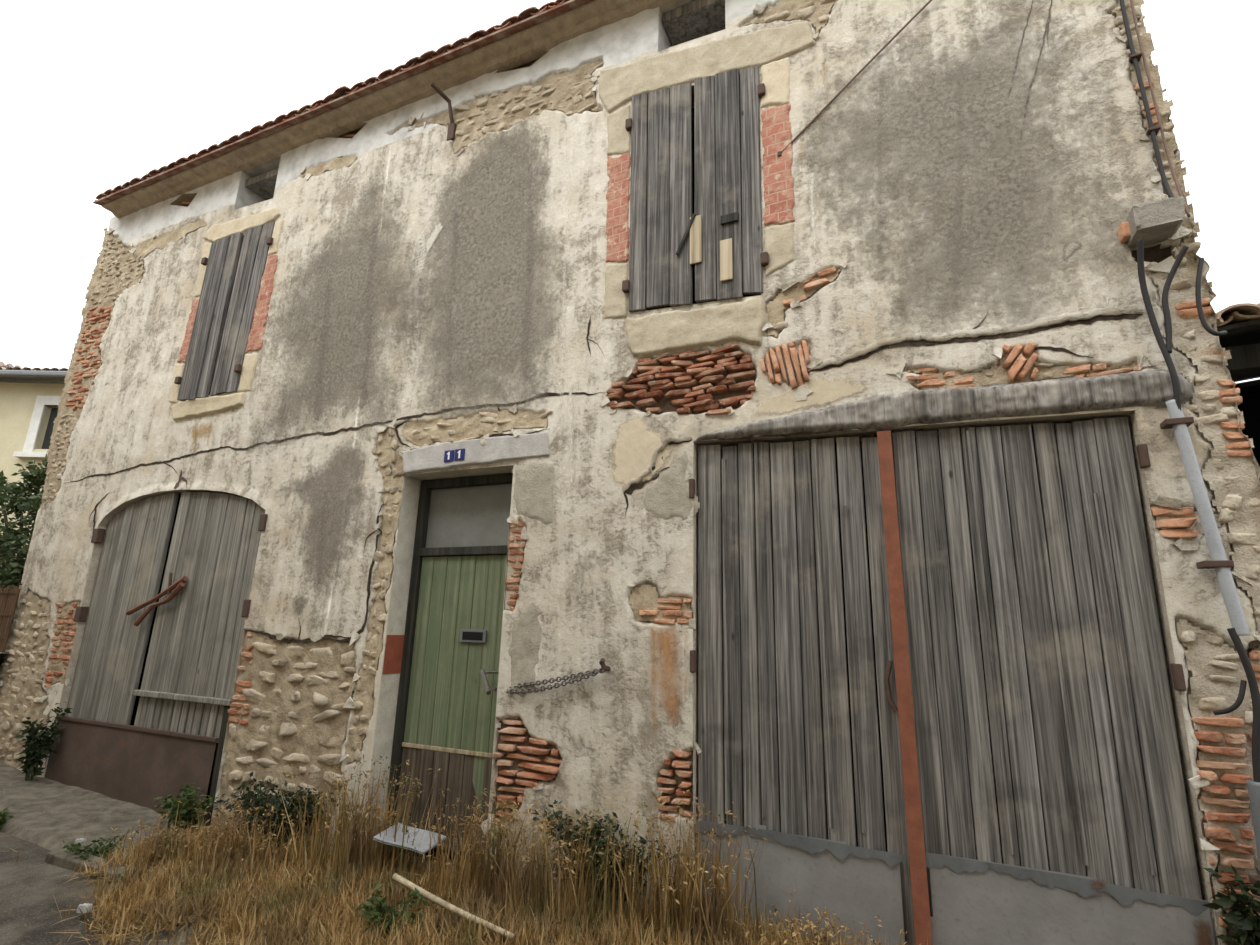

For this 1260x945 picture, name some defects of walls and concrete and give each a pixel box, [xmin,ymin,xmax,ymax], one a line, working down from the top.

flaking render [391,59,605,156]
flaking render [740,0,839,40]
flaking render [40,219,207,508]
leakage [255,124,565,448]
flaking render [599,264,847,416]
crack [802,306,1143,375]
flaking render [886,342,1156,390]
crack [68,392,602,643]
flaking render [1111,0,1260,945]
flaking render [0,583,80,776]
flaking render [214,404,562,849]
flaking render [651,742,702,822]